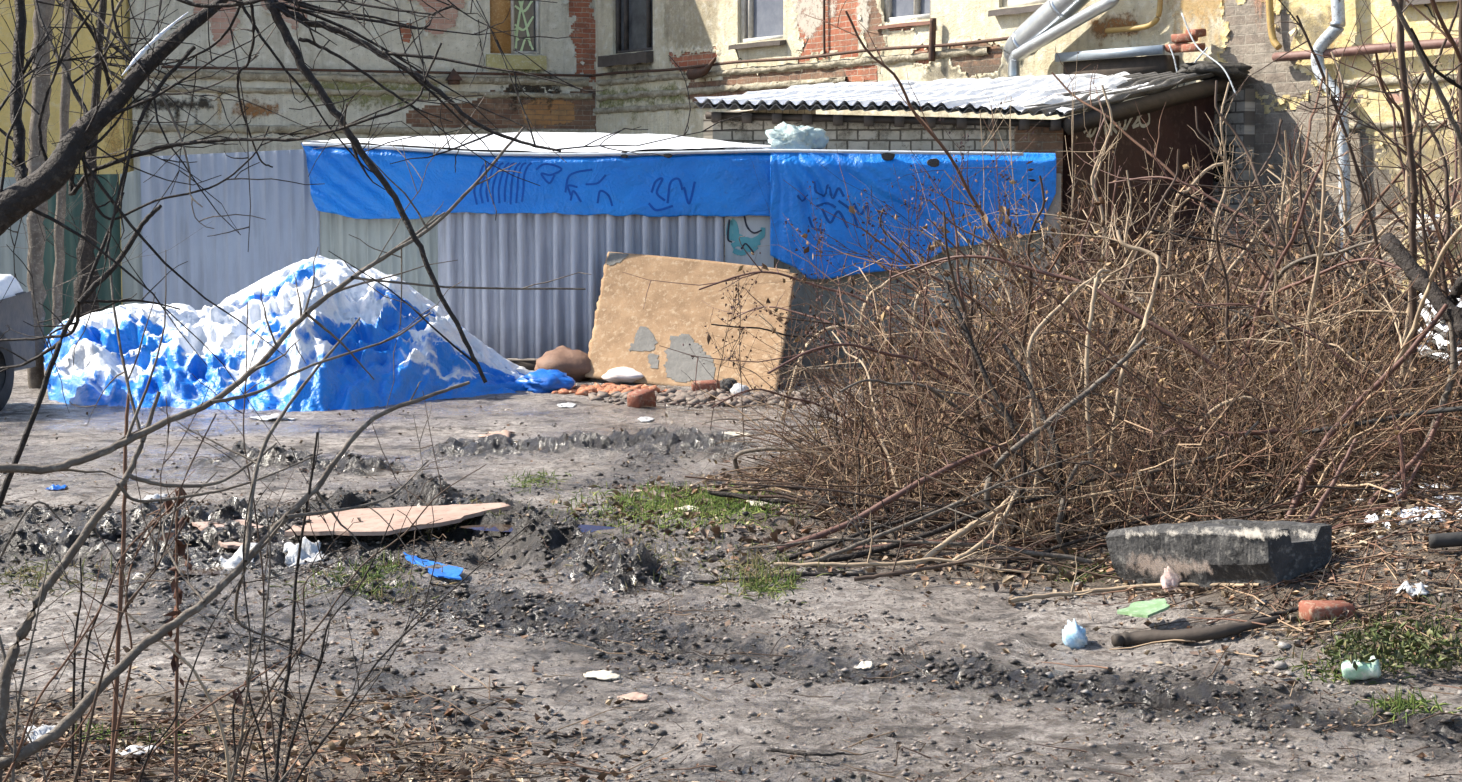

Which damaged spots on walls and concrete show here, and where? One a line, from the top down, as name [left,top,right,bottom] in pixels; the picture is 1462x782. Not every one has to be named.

peeling [397,0,597,135]
peeling [665,0,1006,103]
peeling [1449,172,1462,271]